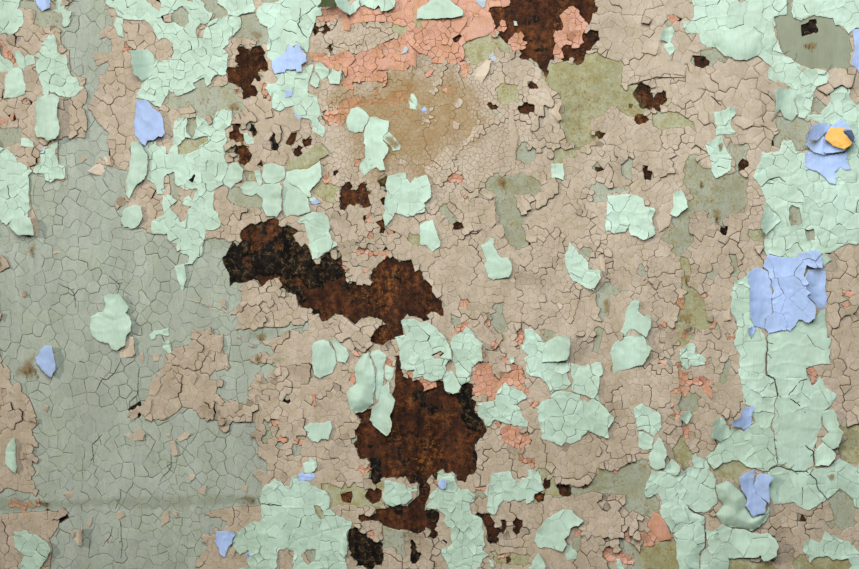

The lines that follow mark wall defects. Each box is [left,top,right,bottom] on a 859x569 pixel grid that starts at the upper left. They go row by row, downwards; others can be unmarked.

peeling [0,0,84,235]
rust [227,46,268,110]
rust [489,0,599,78]
crack [630,75,684,85]
peeling [90,293,172,364]
crack [0,0,309,569]
rust [223,219,443,345]
peeling [367,0,859,569]
crack [766,334,806,413]
peeling [215,419,418,569]
rust [348,356,487,569]
crack [769,429,827,499]